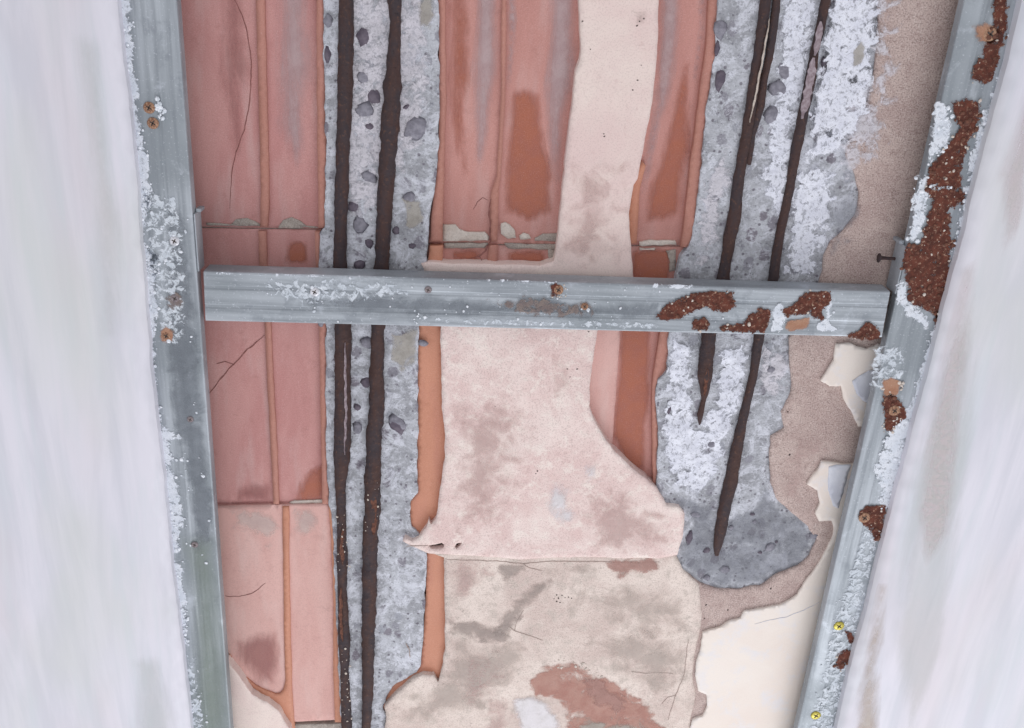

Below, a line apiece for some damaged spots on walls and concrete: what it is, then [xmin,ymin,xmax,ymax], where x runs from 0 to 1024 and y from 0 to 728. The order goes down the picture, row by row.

crack [209,339,260,394]
crack [230,1,252,198]
corrosion [333,0,354,269]
corrosion [373,0,402,270]
water stain [508,0,570,218]
flaking render [279,0,959,728]
corrosion [656,0,832,556]
water stain [759,0,900,274]
corrosion [900,98,983,325]
corrosion [971,0,1010,84]
corrosion [333,324,386,728]
corrosion [858,505,888,542]